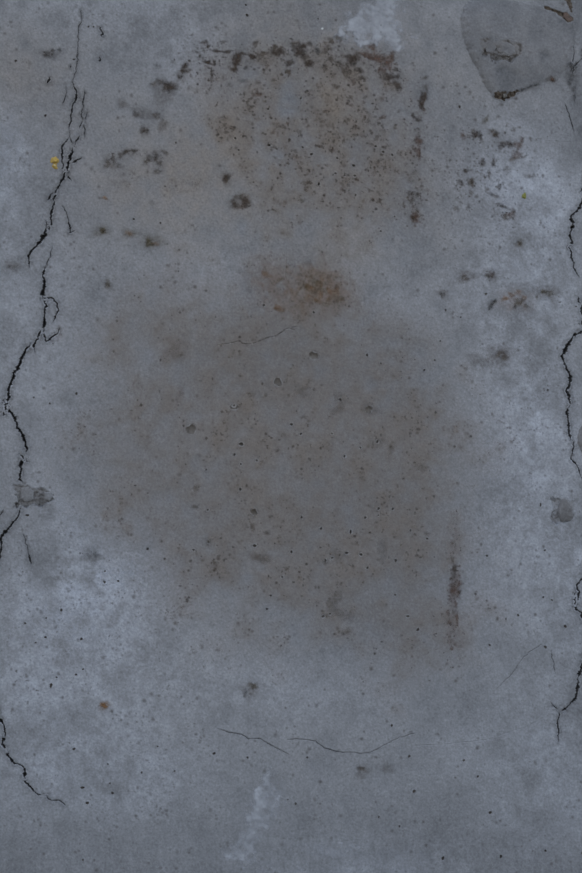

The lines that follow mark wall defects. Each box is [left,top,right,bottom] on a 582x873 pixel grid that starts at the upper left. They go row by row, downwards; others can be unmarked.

corrosion [164,36,401,90]
spalling [477,35,526,66]
spalling [492,88,522,103]
crack [563,44,582,132]
crack [0,9,105,565]
crack [559,186,582,481]
spalling [8,475,56,511]
crack [572,565,582,621]
crack [496,643,582,743]
crack [0,716,68,807]